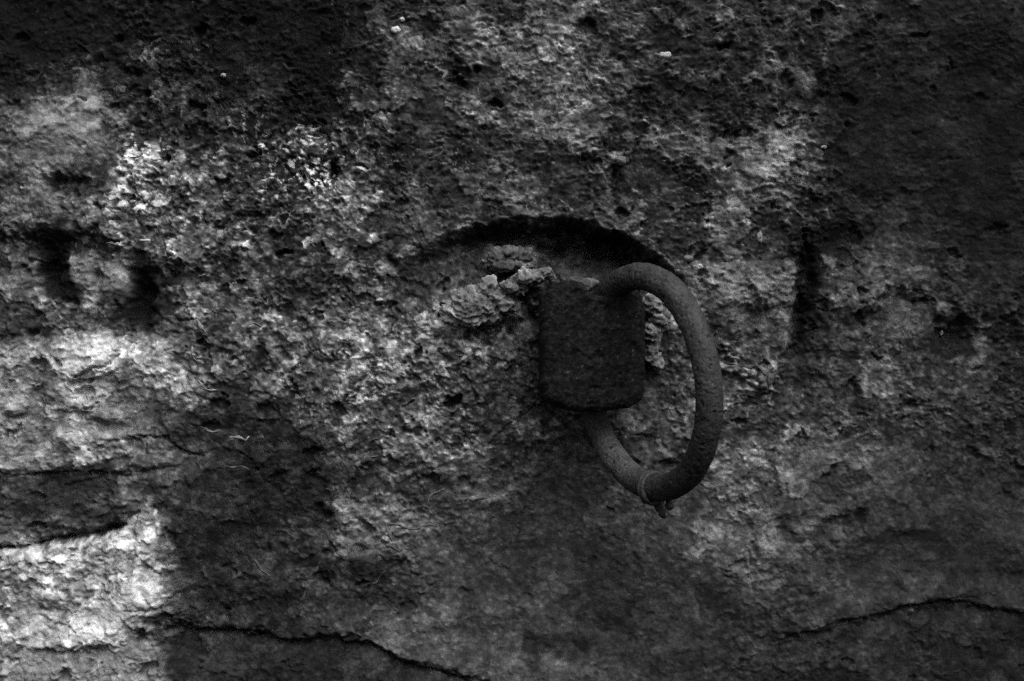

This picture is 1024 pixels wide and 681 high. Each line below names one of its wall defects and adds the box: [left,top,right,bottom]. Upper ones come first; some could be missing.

spalling [398,216,645,296]
crack [158,600,469,681]
crack [770,596,1024,643]